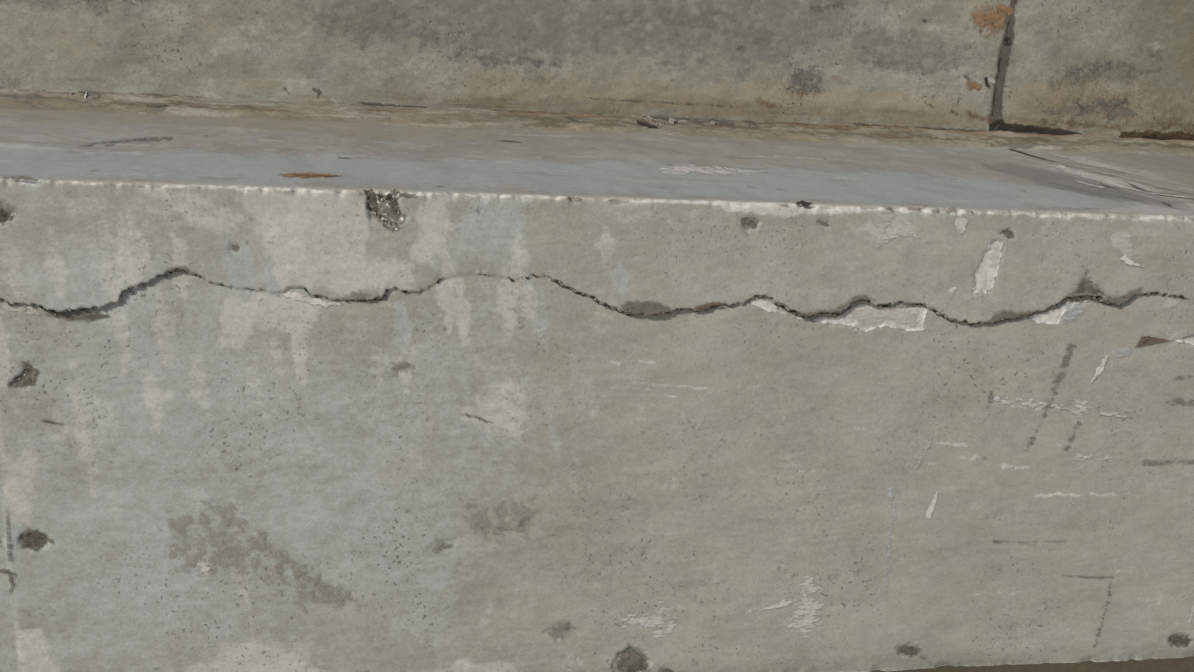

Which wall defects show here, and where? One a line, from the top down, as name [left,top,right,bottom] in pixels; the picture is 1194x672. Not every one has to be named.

rust [972,0,1017,35]
crack [854,0,1194,210]
spalling [0,207,13,225]
spalling [364,189,416,232]
peeling [973,230,1014,302]
crack [0,266,263,321]
crack [304,278,443,303]
crack [478,274,1187,327]
crack [1136,336,1173,347]
peeling [1161,298,1194,345]